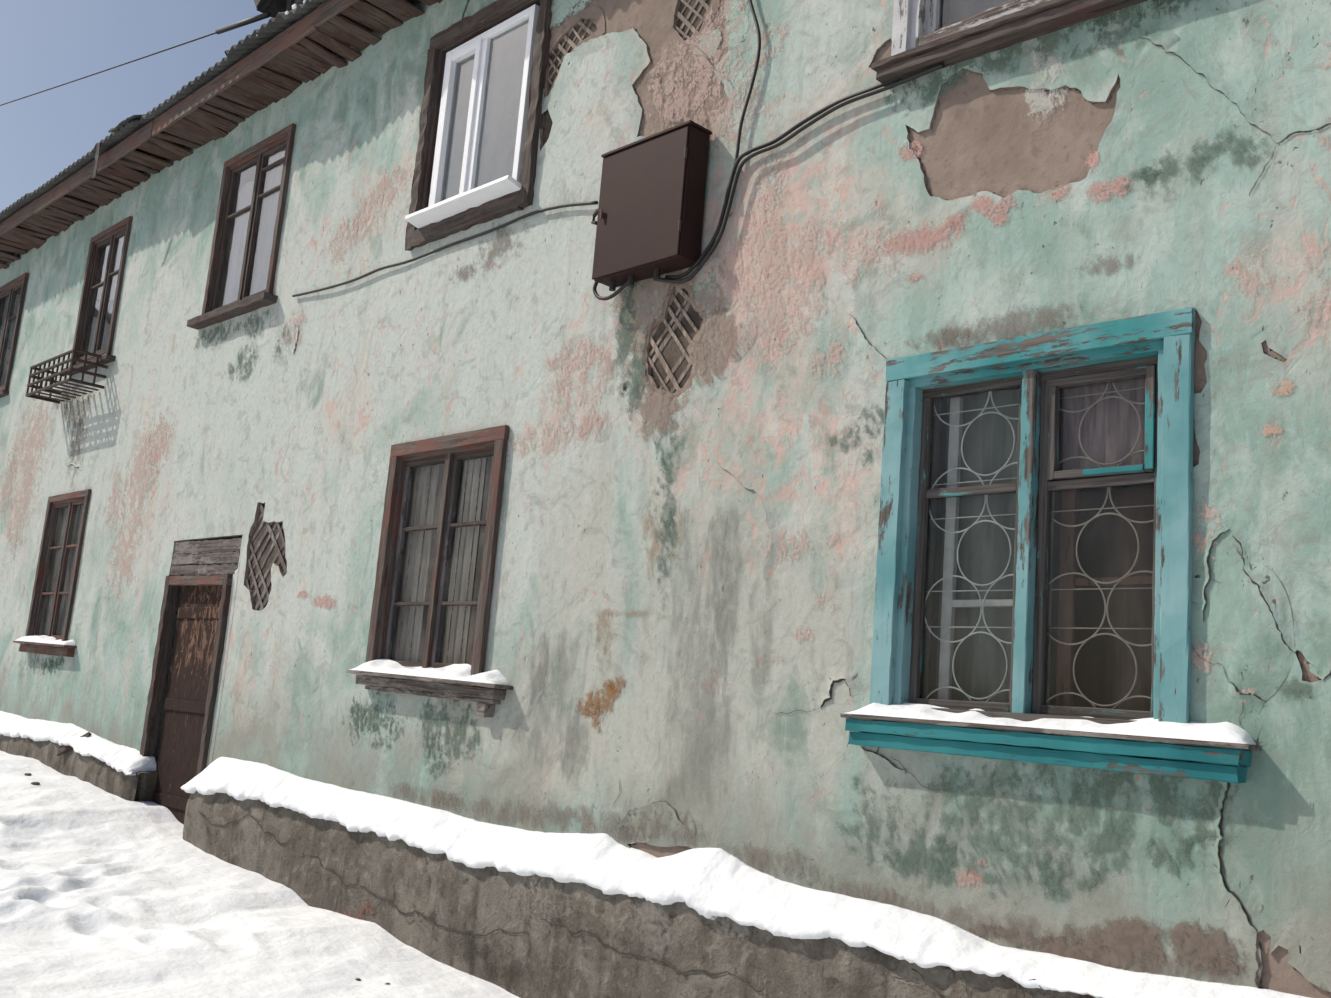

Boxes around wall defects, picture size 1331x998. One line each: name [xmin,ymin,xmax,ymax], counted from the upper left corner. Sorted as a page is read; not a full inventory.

flaking render [537,0,787,162]
flaking render [883,58,1135,256]
crack [1140,23,1331,196]
flaking render [642,283,708,401]
flaking render [1247,326,1303,396]
flaking render [238,491,337,623]
water stain [343,692,403,748]
water stain [393,700,479,804]
crack [1192,517,1331,989]
water stain [841,764,1238,899]
crack [199,812,764,998]
flaking render [969,913,1331,998]